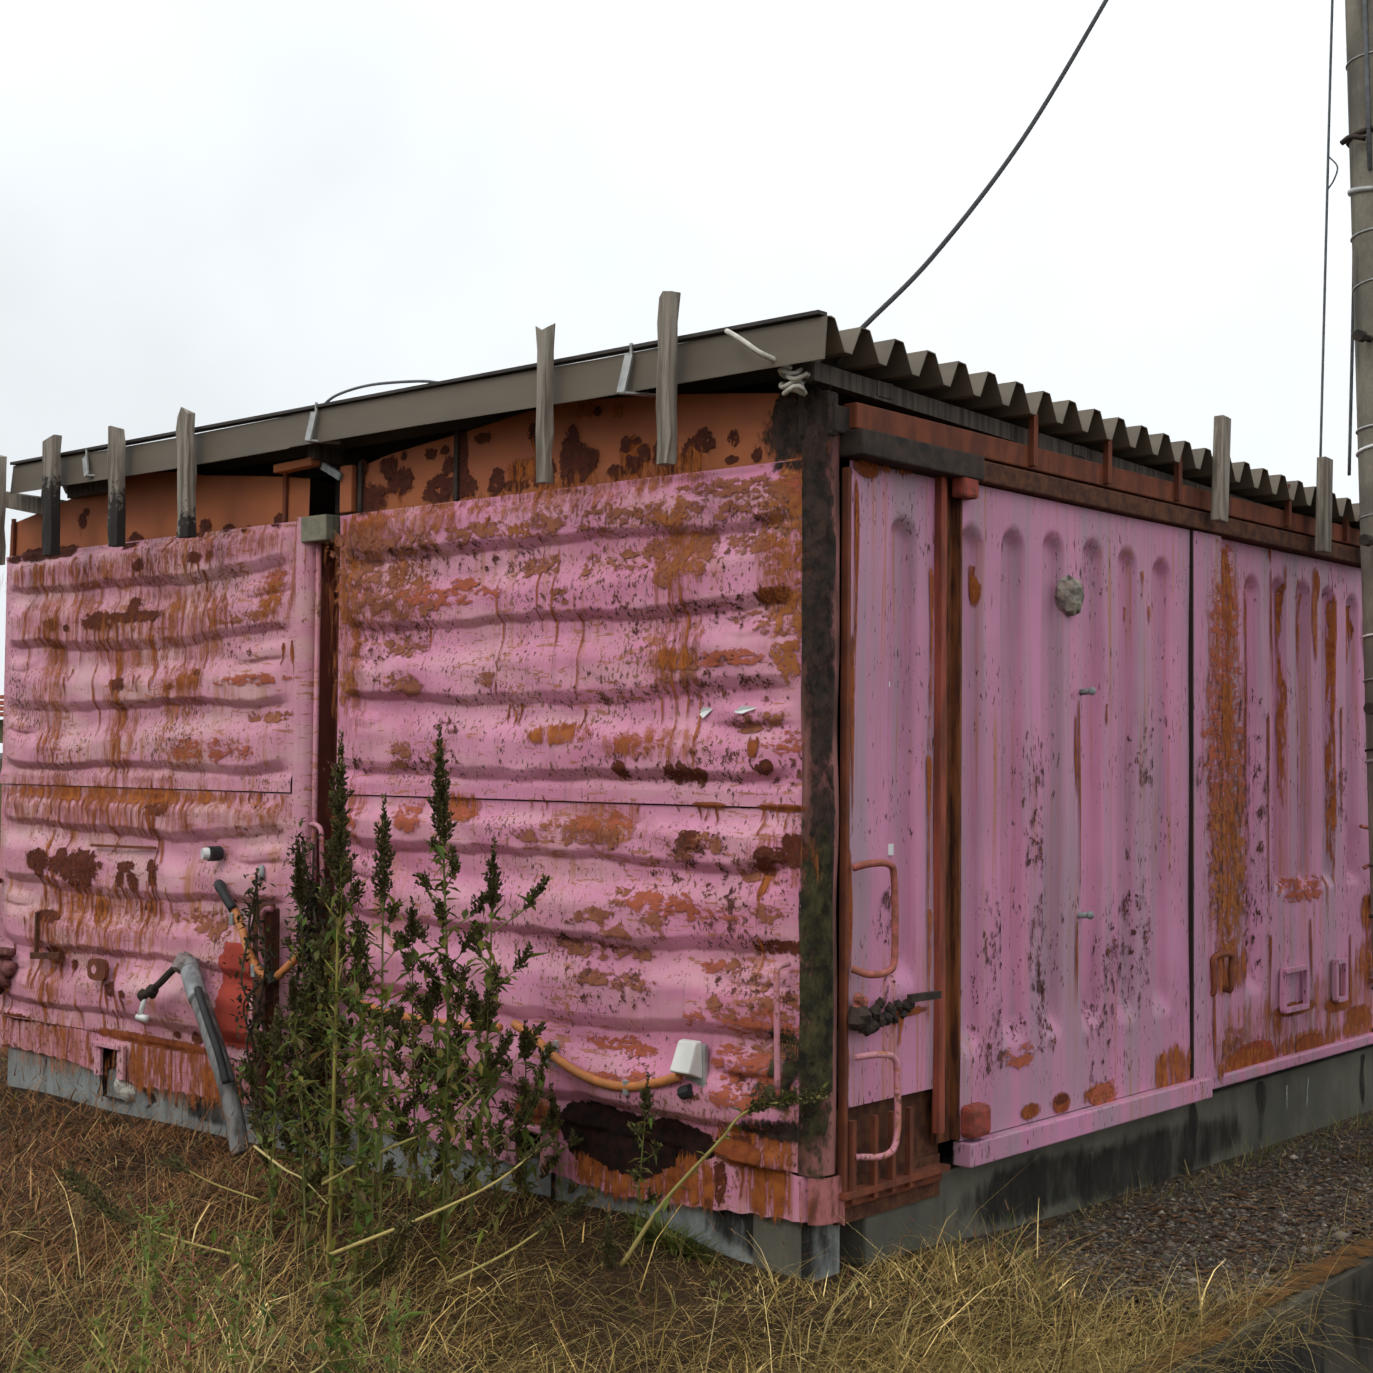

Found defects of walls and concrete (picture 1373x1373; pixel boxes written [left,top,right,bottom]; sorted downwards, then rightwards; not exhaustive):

corrosion [343,403,763,535]
corrosion [0,508,306,1106]
peeling [323,458,834,1179]
corrosion [674,802,726,825]
corrosion [756,804,806,835]
leakage [808,582,835,1073]
corrosion [850,459,912,834]
peeling [971,765,1058,1103]
peeling [1081,857,1153,1084]
peeling [1125,712,1154,802]
corrosion [1156,537,1373,1089]
corrosion [569,1117,811,1224]